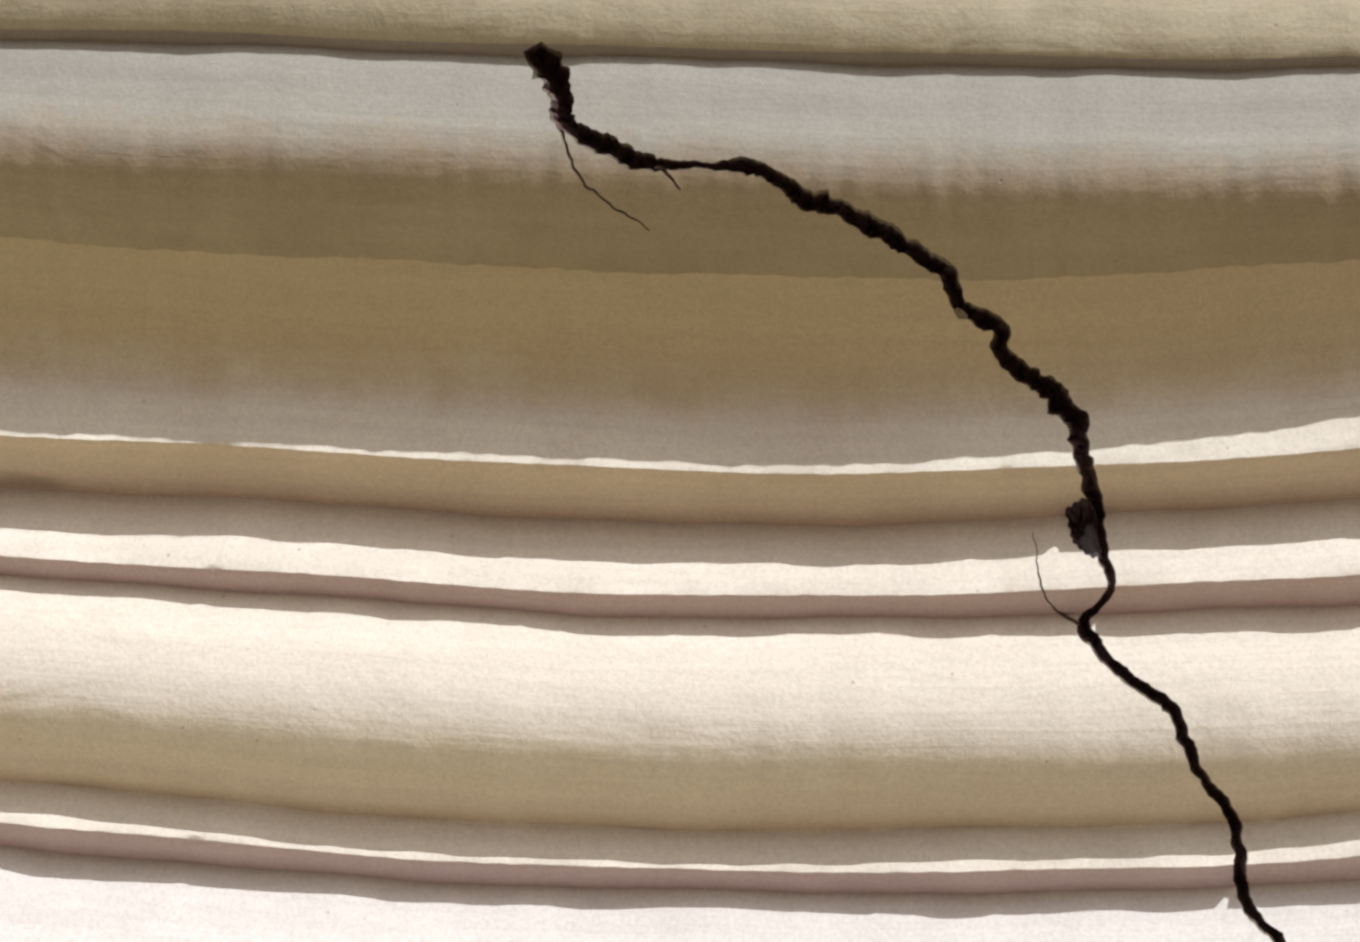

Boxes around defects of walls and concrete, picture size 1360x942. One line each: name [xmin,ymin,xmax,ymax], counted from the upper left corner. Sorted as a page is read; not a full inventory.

crack [524,43,1286,942]